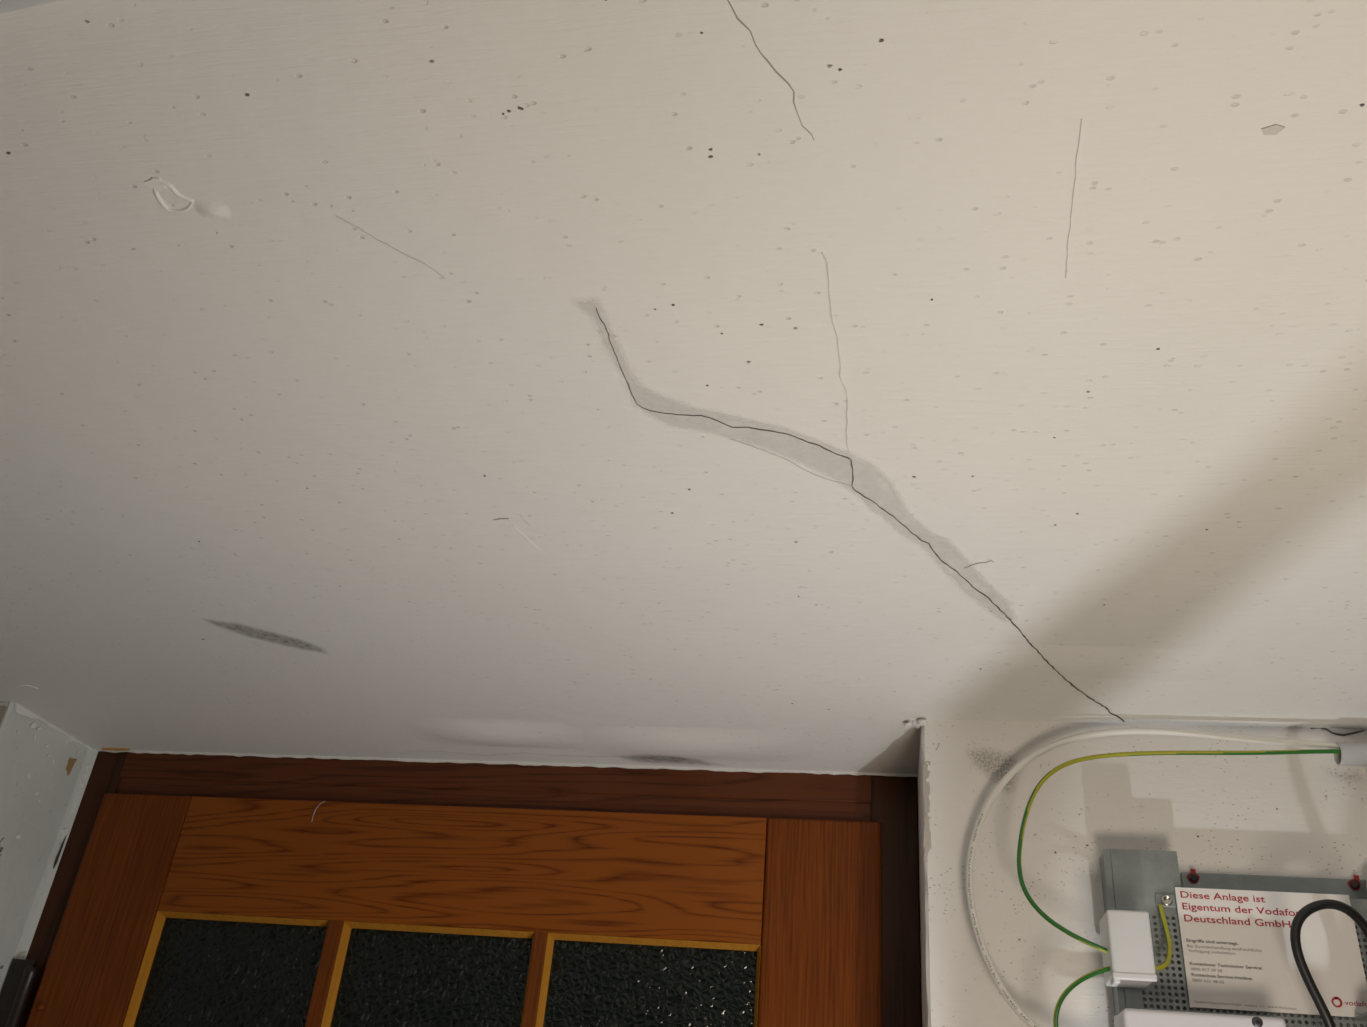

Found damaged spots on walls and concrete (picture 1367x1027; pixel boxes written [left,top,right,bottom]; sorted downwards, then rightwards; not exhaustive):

crack [727,0,814,140]
crack [596,253,1125,722]